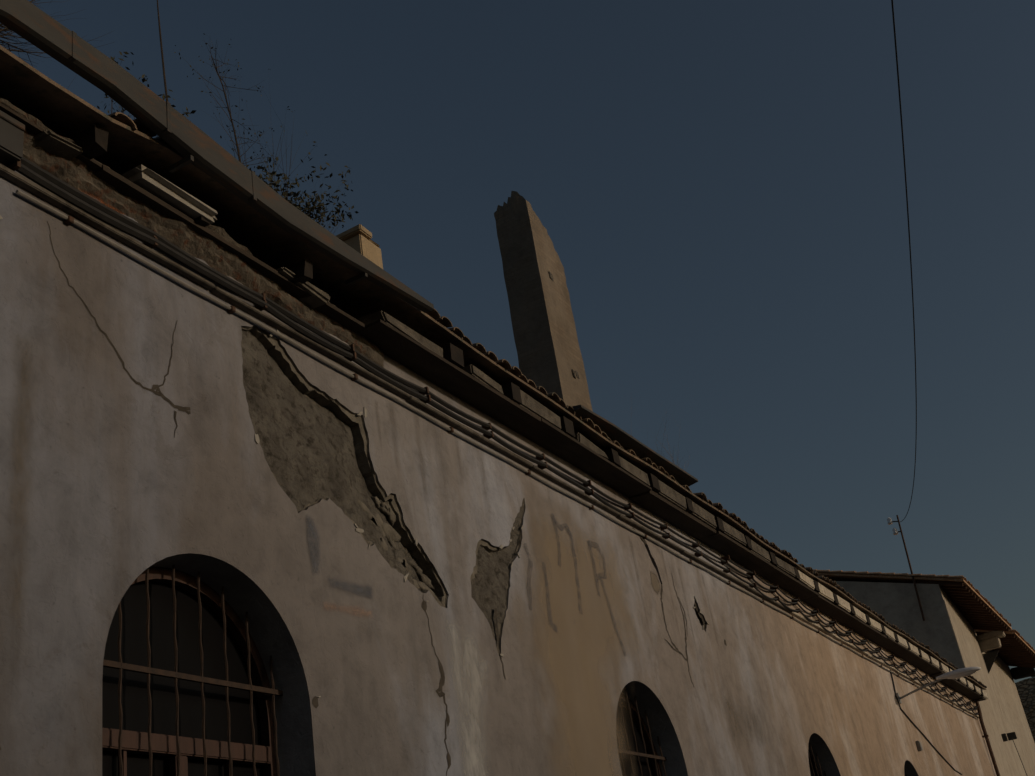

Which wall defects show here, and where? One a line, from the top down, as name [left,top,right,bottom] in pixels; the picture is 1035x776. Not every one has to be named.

crack [47,221,191,438]
spalling [241,326,448,611]
crack [423,594,451,776]
spalling [470,498,525,659]